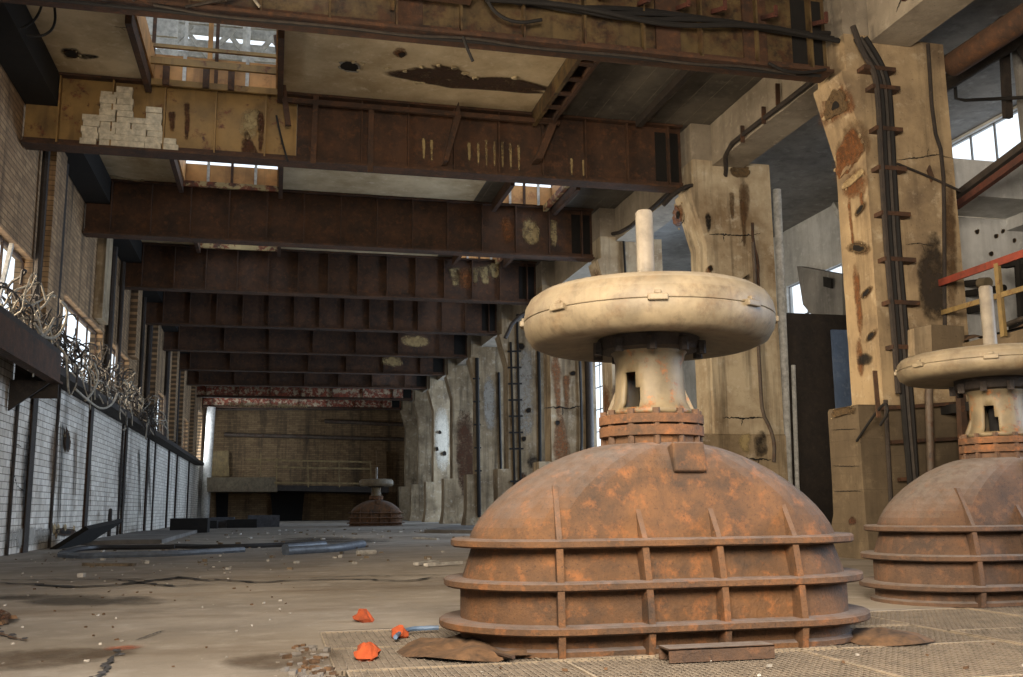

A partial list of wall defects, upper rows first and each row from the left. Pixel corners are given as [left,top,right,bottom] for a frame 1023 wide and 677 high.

spalling [821,85,854,122]
spalling [833,124,870,190]
corrosion [844,173,865,243]
crack [1,574,451,587]
crack [0,628,28,640]
crack [89,630,163,677]